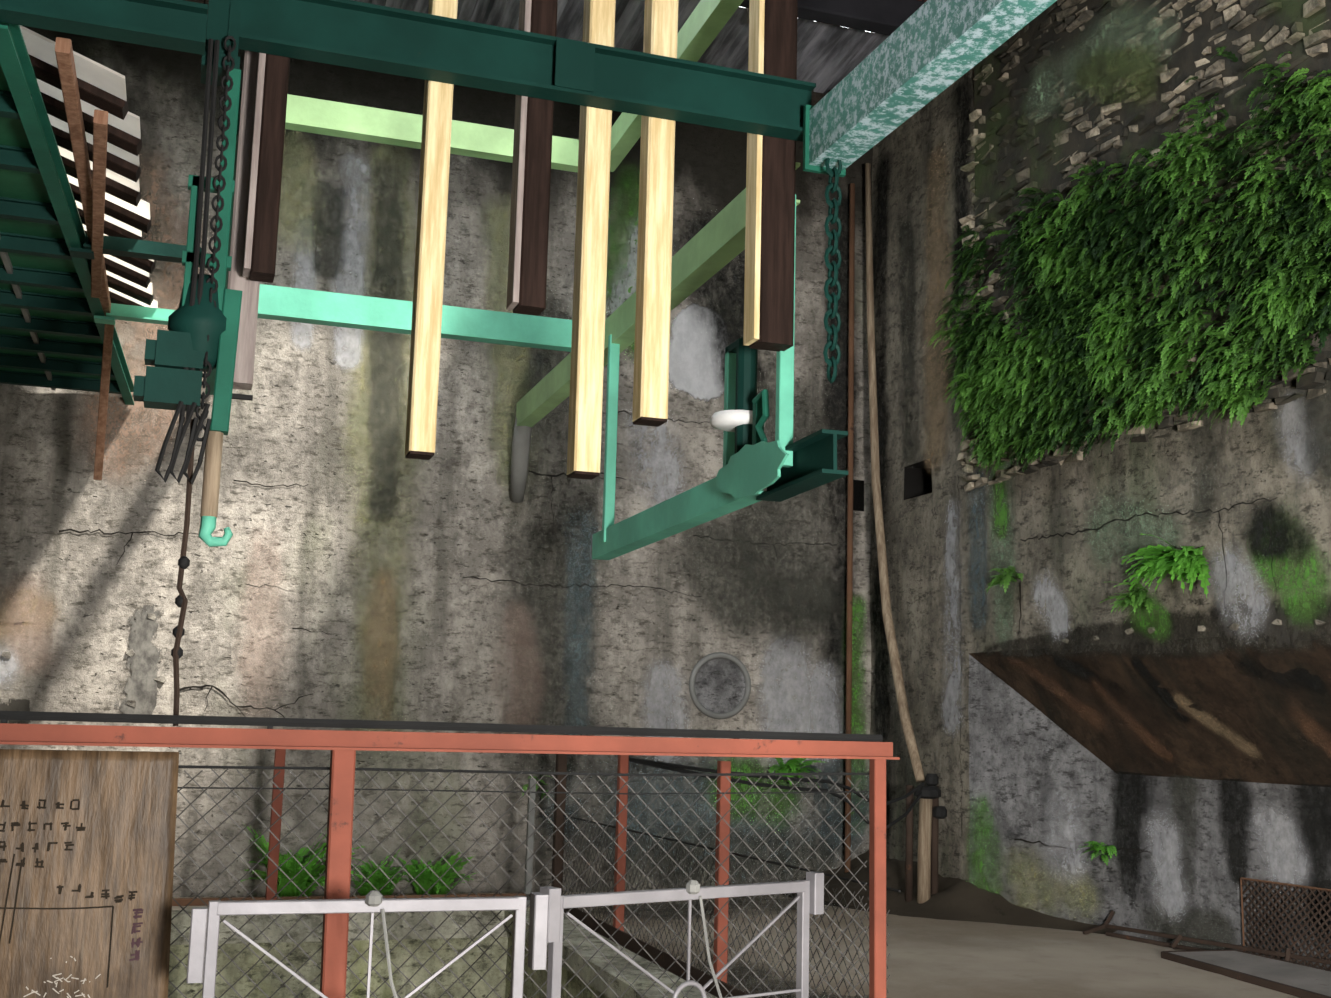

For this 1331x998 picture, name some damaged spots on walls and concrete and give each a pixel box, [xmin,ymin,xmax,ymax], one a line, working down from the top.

leakage [1282,349,1331,480]
leakage [1191,418,1215,524]
leakage [1246,503,1309,558]
leakage [1034,579,1068,635]
leakage [1214,552,1264,626]
leakage [1114,771,1233,950]
leakage [1220,778,1331,932]
leakage [703,962,869,998]